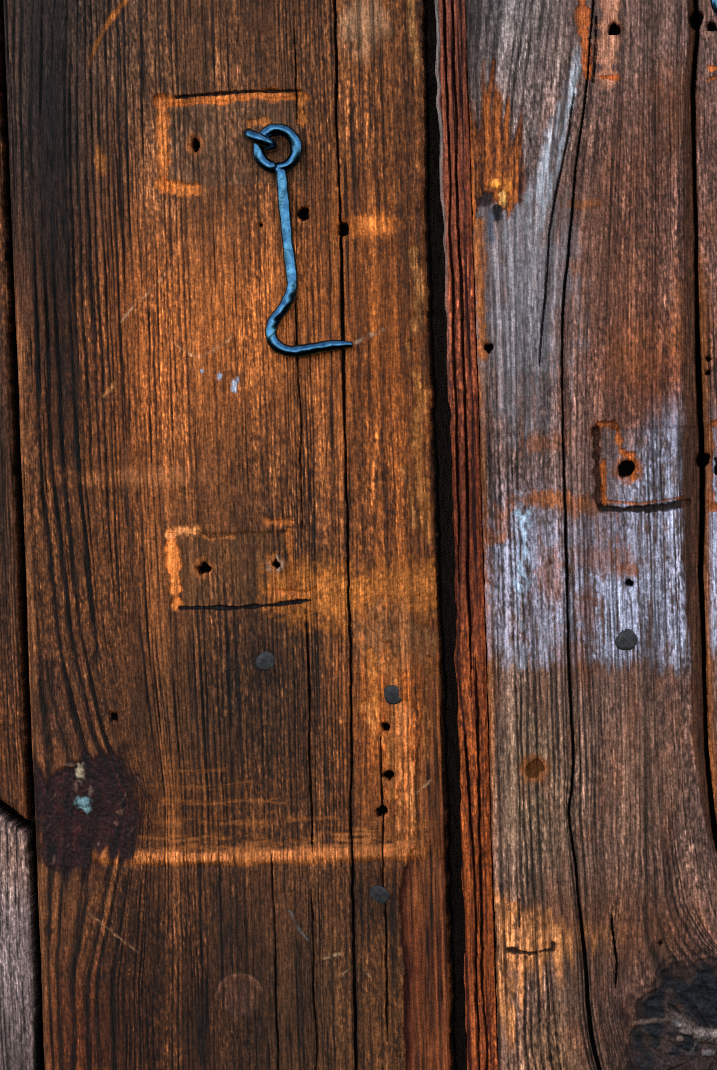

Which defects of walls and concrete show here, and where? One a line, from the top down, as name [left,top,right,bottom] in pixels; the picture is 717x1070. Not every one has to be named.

crack [539,0,618,1070]
crack [682,0,717,851]